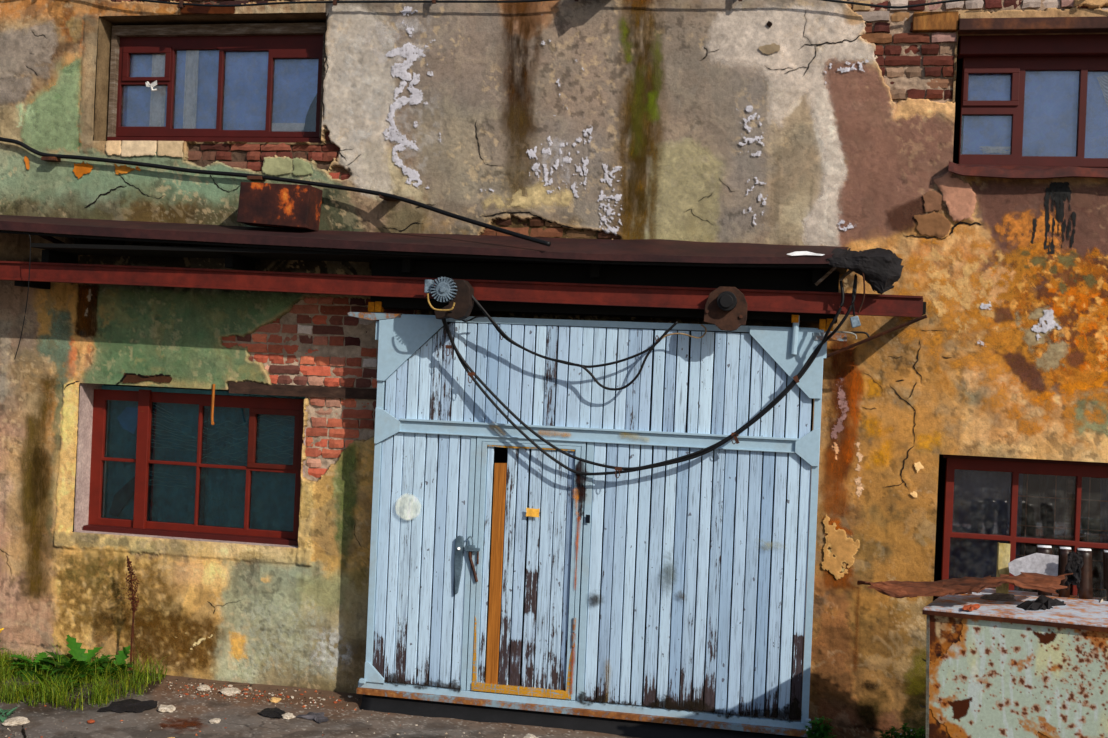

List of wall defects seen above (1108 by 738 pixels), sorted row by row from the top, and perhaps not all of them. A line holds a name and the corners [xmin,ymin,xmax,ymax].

peeling [73,161,93,179]
crack [84,169,164,208]
flaking render [105,8,393,191]
water stain [383,6,435,189]
water stain [505,2,593,198]
water stain [597,0,661,240]
crack [764,10,862,76]
flaking render [709,0,1108,256]
flaking render [222,297,417,481]
crack [863,330,952,490]
water stain [22,378,218,672]